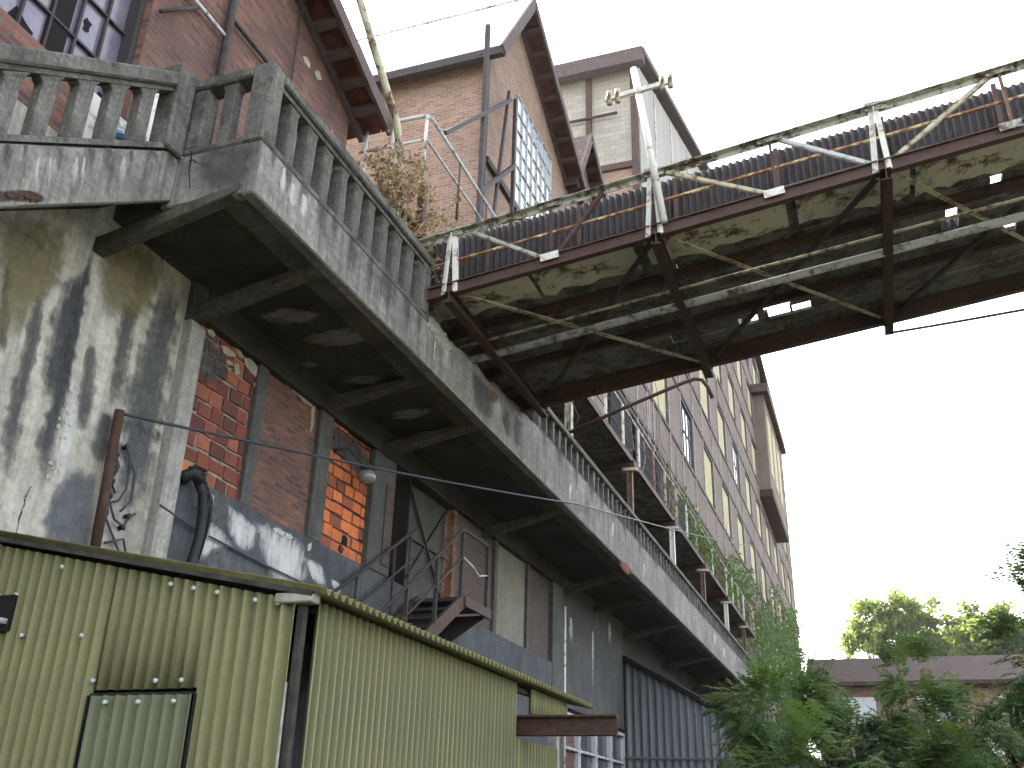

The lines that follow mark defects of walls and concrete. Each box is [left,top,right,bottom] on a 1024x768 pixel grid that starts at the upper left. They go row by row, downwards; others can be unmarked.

damp [0,270,8,345]
damp [2,257,179,506]
damp [203,547,245,572]